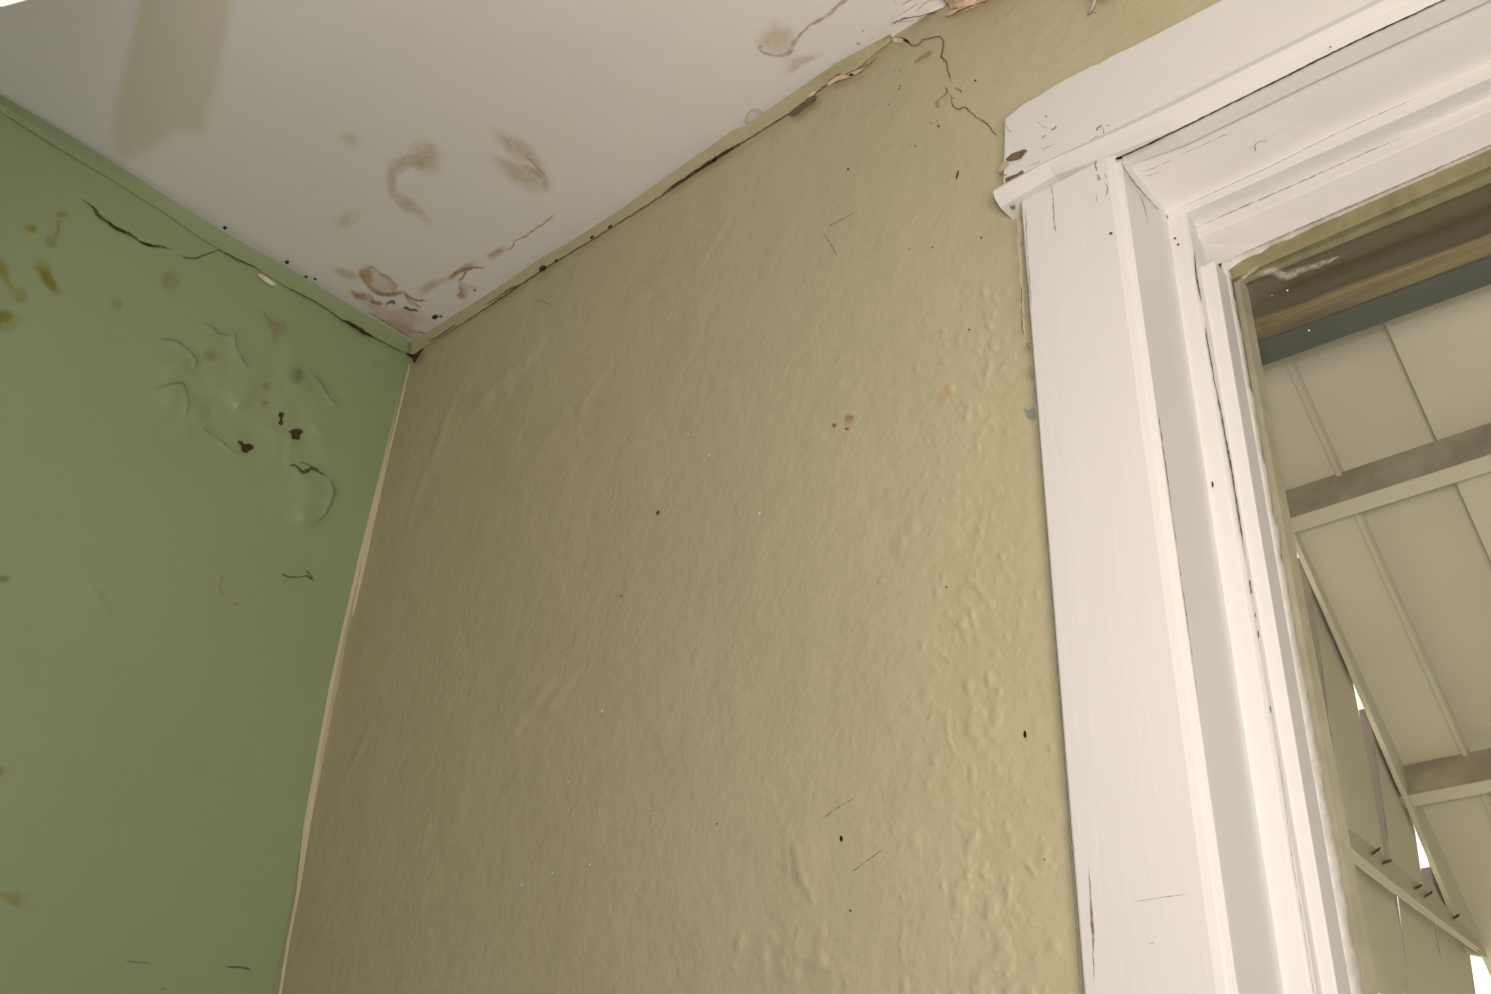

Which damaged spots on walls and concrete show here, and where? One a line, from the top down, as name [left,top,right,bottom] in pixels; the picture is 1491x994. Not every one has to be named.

crack [903,36,1056,229]
crack [1091,0,1445,221]
crack [85,201,253,266]
leakage [356,292,442,334]